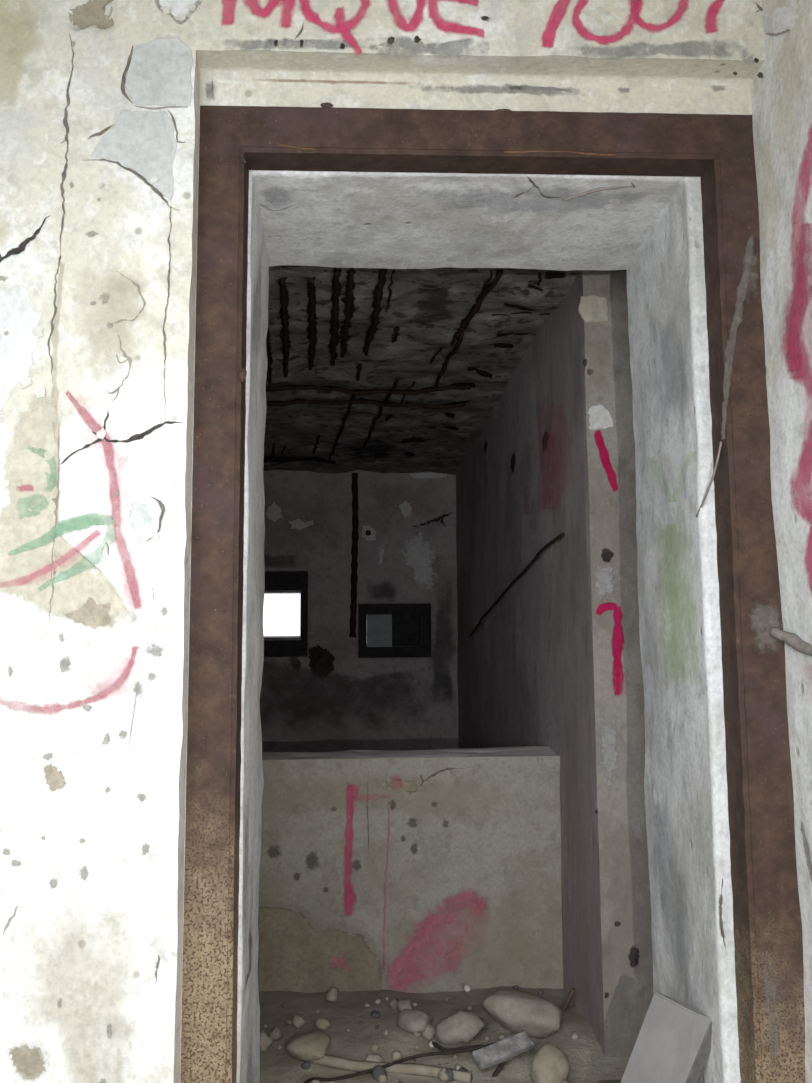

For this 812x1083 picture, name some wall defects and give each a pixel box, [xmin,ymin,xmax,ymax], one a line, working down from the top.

peeling [157,0,201,24]
flaking render [92,38,192,200]
crack [0,34,183,621]
spalling [266,268,504,460]